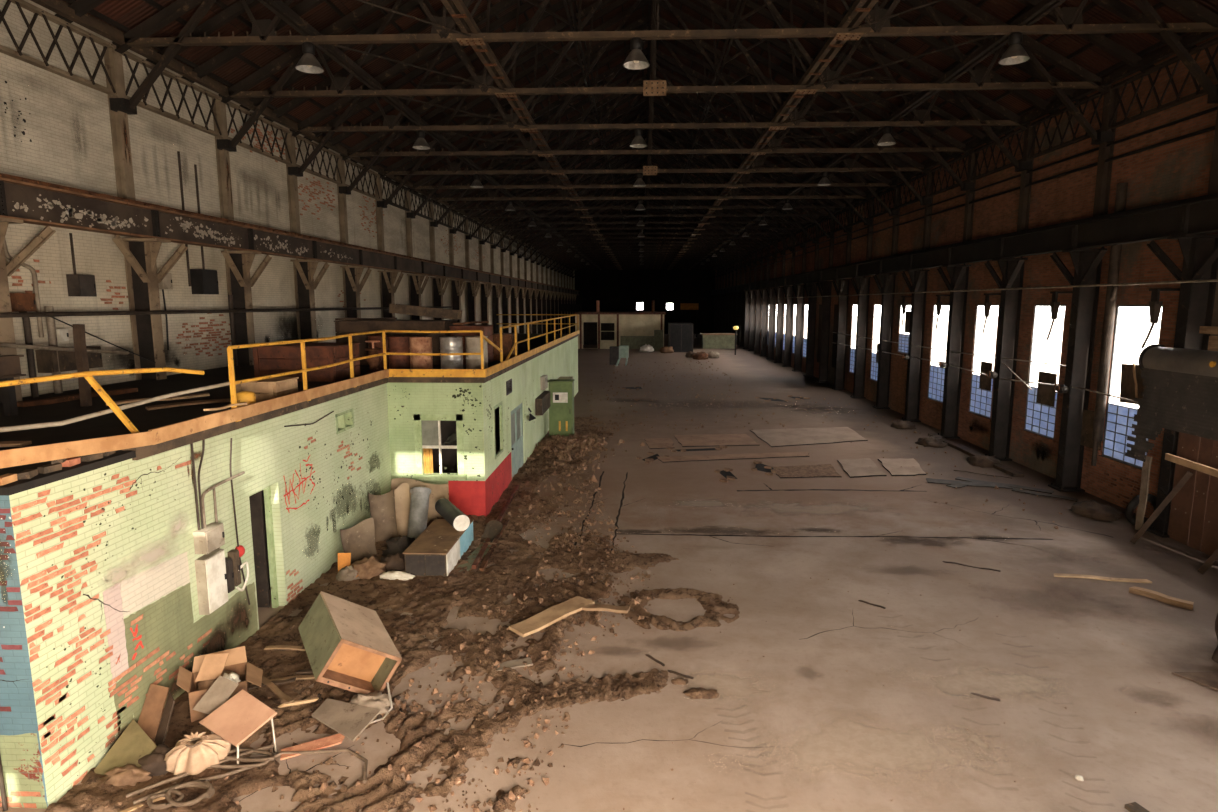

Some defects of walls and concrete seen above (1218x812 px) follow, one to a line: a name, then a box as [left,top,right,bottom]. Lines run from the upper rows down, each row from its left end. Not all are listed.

peeling [12,194,148,229]
peeling [165,217,308,255]
peeling [176,313,231,356]
peeling [0,460,212,786]